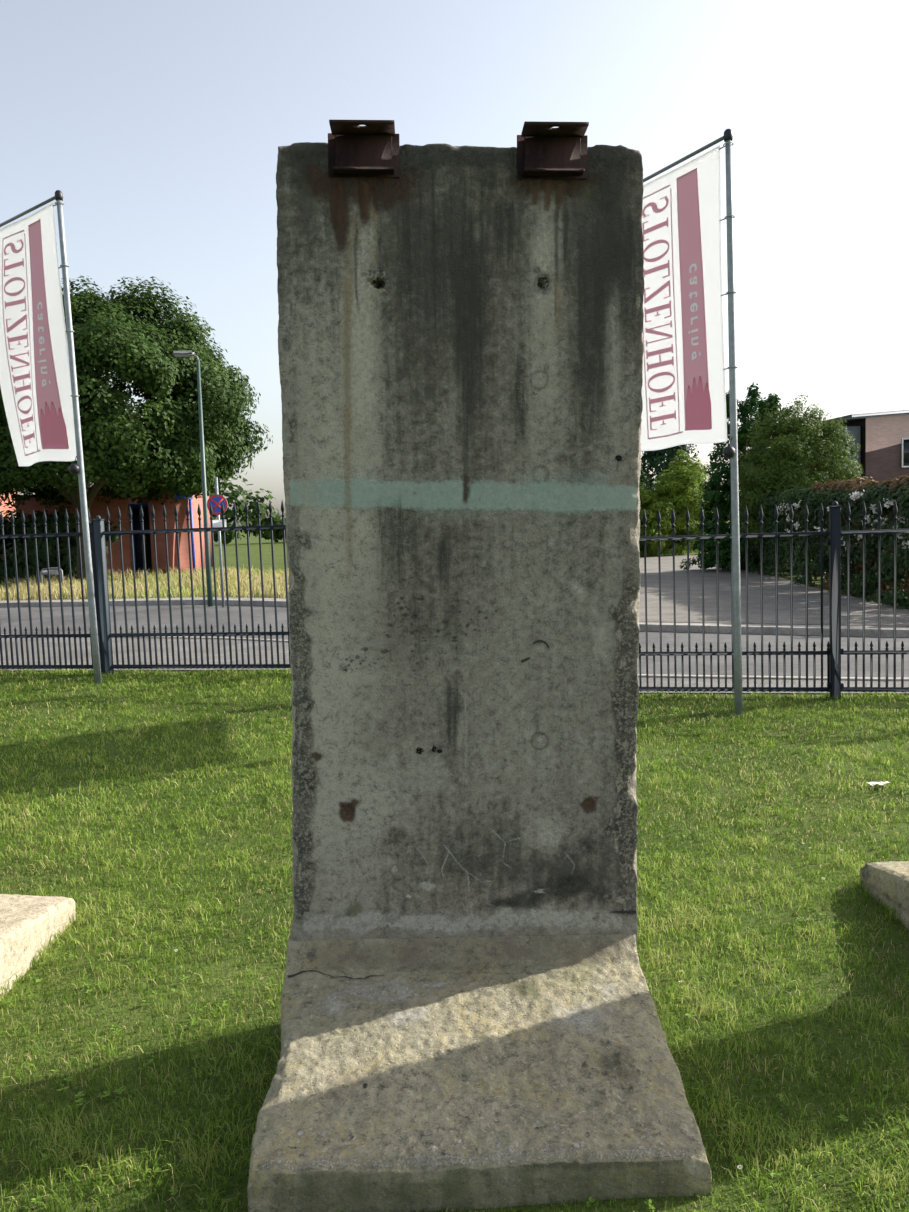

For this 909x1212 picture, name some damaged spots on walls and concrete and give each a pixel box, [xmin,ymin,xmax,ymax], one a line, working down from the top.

rust [304,164,421,249]
damp [533,230,558,324]
damp [347,226,381,434]
damp [303,907,623,935]
crack [287,970,381,979]